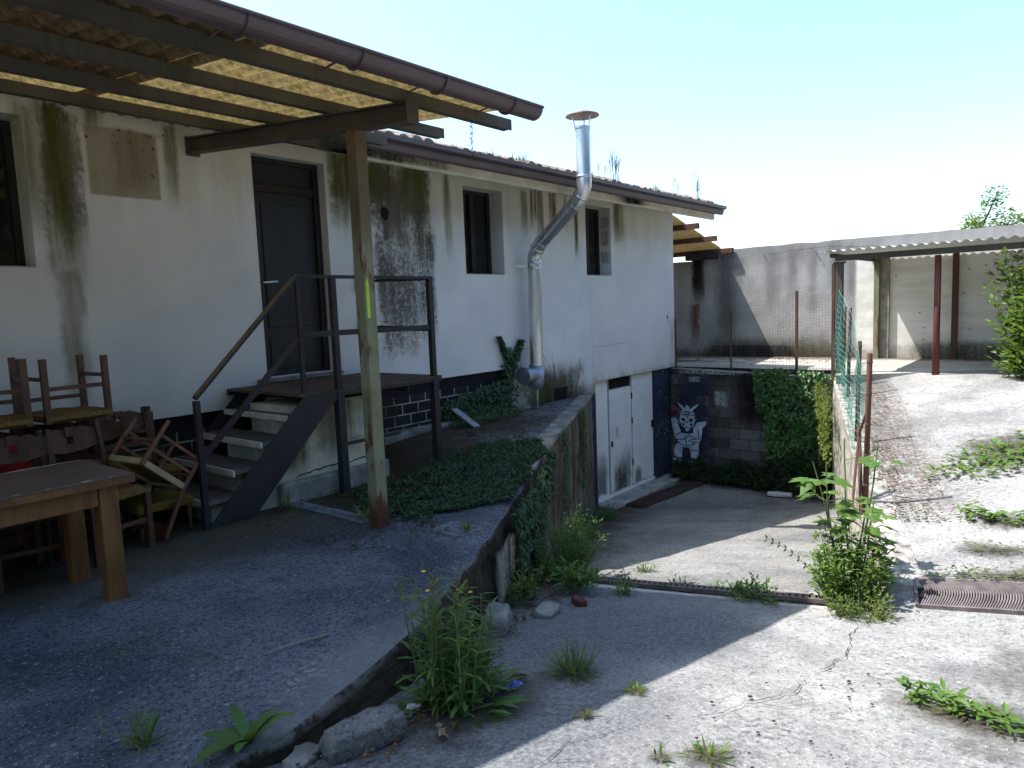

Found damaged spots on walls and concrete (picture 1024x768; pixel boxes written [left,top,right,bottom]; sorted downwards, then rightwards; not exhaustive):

water stain [25,103,88,251]
water stain [328,149,349,202]
water stain [367,149,448,351]
water stain [522,190,556,229]
water stain [601,197,641,261]
water stain [692,260,704,298]
crack [690,619,874,719]